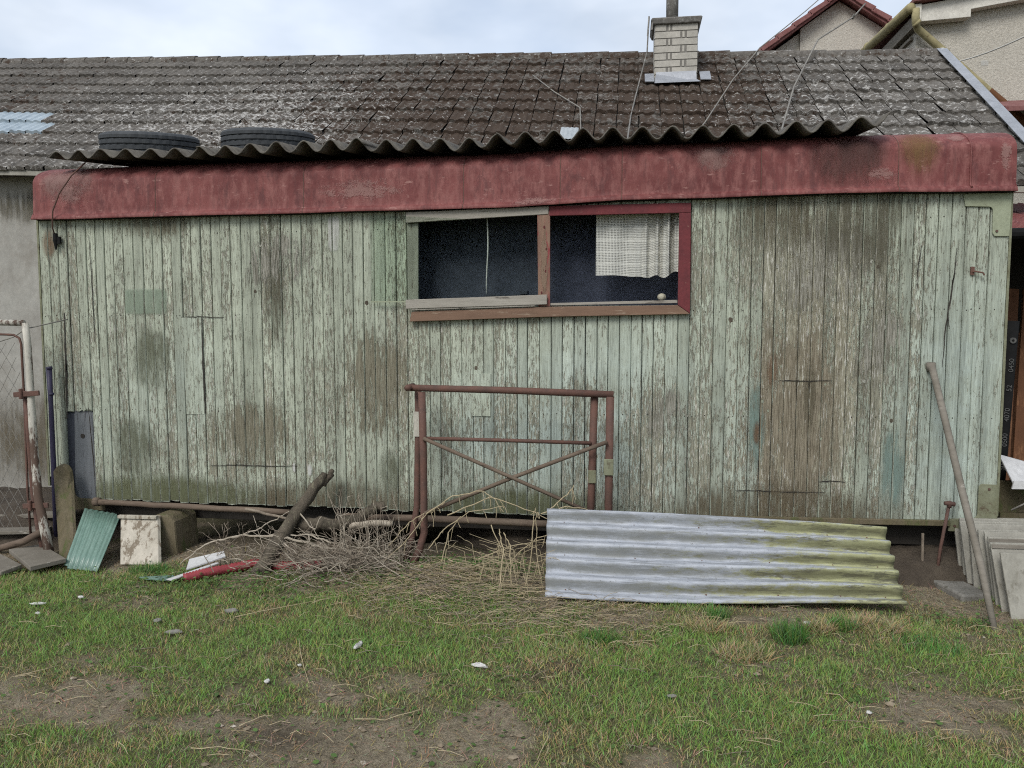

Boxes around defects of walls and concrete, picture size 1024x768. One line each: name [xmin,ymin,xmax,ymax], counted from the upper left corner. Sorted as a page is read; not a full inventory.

peeling [246,232,313,288]
peeling [540,226,548,294]
peeling [342,328,411,445]
peeling [742,220,880,512]
peeling [855,308,914,398]
crack [942,252,957,367]
peeling [210,402,295,472]